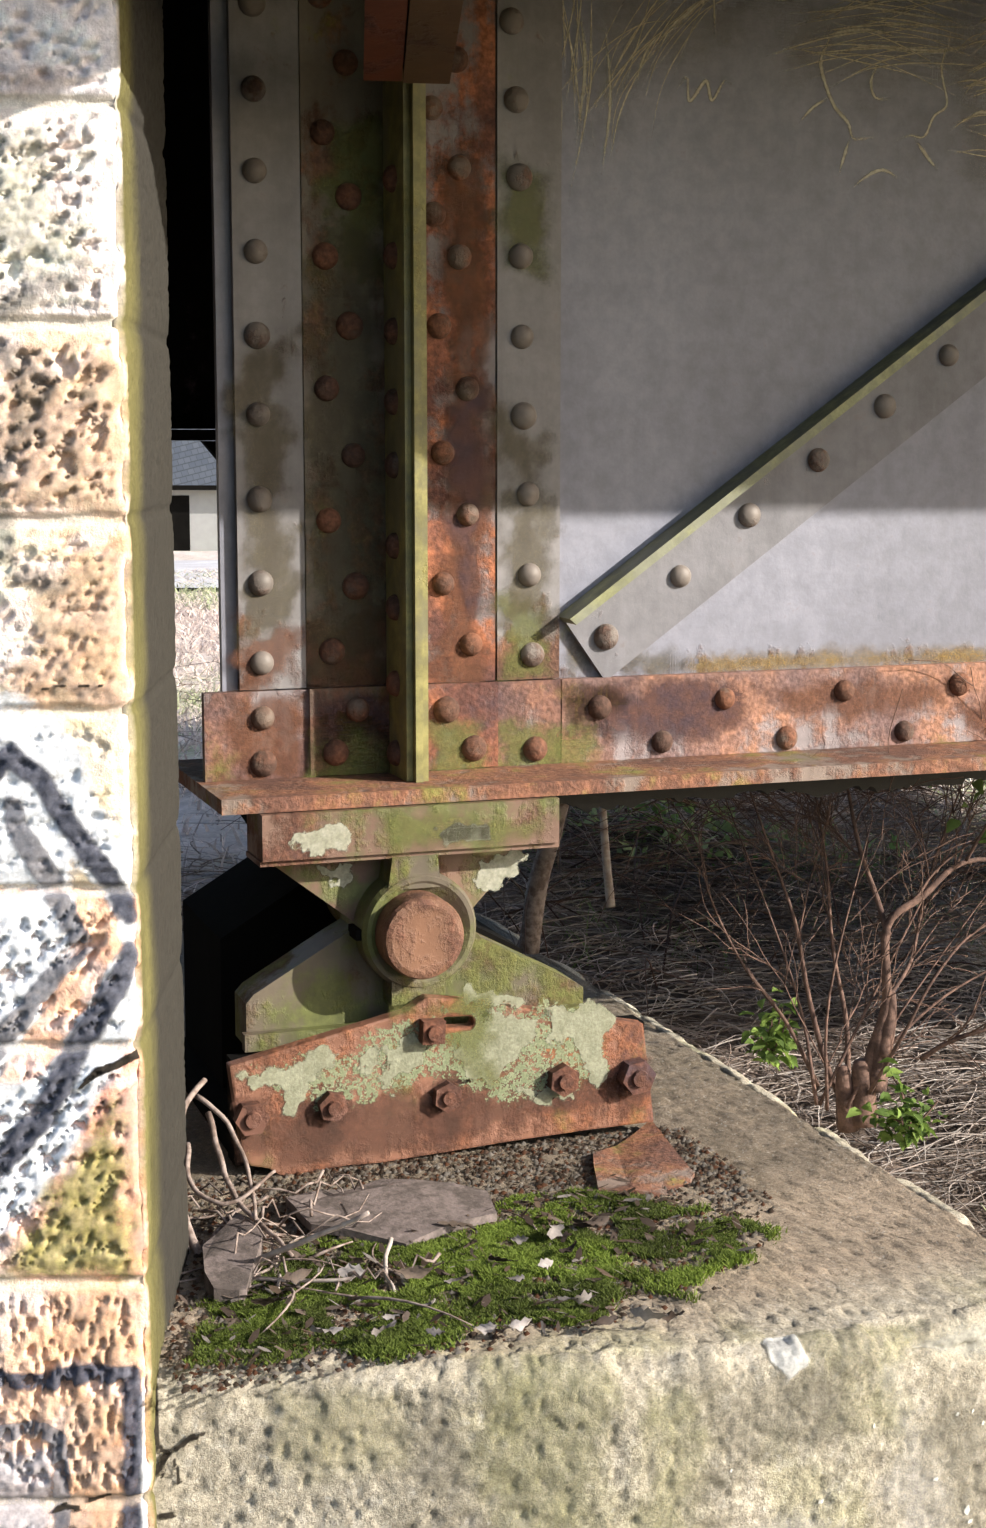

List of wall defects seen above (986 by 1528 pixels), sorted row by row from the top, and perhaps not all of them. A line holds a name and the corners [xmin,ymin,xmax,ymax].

rust [433,137,497,684]
rust [228,616,390,780]
rust [563,679,743,740]
rust [781,680,935,719]
peeling [288,823,353,888]
peeling [435,822,528,892]
peeling [235,1044,338,1117]
rust [245,1080,534,1162]
peeling [357,1033,427,1097]
peeling [453,983,616,1089]
peeling [516,1086,574,1106]
rust [552,1077,643,1110]